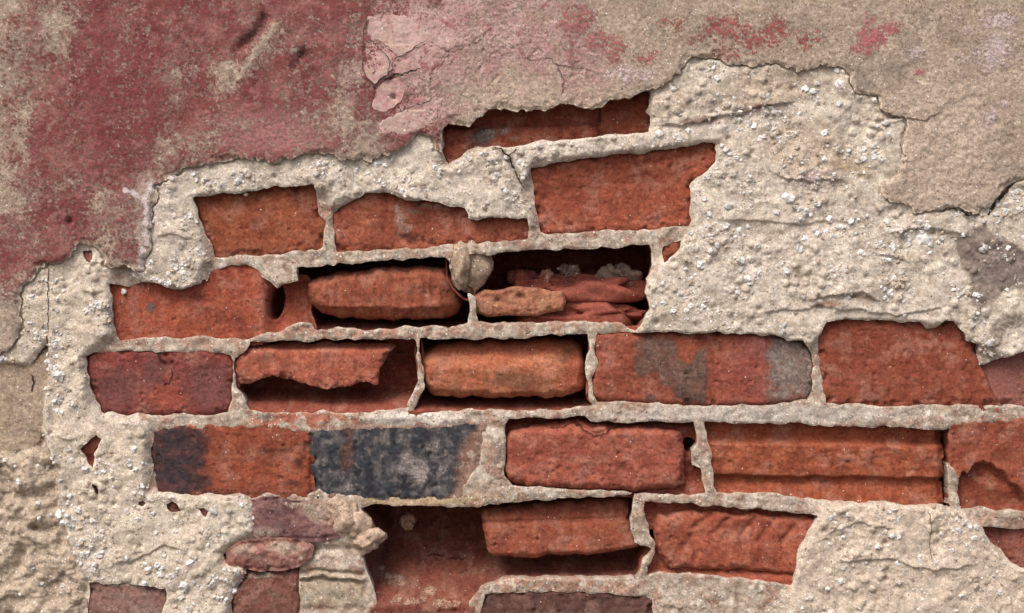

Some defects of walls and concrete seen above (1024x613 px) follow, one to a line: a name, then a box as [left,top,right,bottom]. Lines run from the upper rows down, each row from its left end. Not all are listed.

crack [519,57,595,95]
peeling [343,81,378,123]
peeling [103,231,143,265]
spalling [978,239,1011,265]
spalling [299,256,470,331]
spalling [243,334,1024,613]